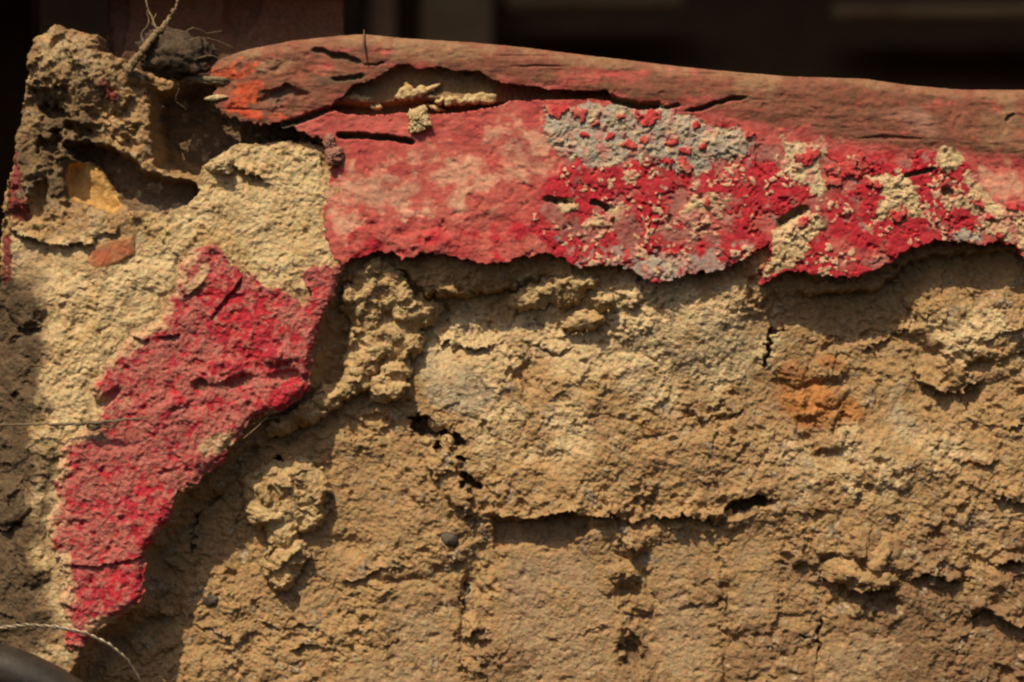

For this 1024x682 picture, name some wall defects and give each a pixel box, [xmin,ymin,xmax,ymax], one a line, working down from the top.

crack [281,47,750,145]
peeling [542,100,755,176]
peeling [8,152,32,221]
peeling [556,198,579,213]
peeling [585,204,631,233]
peeling [639,250,694,280]
peeling [675,192,736,227]
peeling [762,209,826,279]
peeling [777,135,922,223]
peeling [934,146,1024,253]
spalling [15,140,341,584]
crack [763,326,785,368]